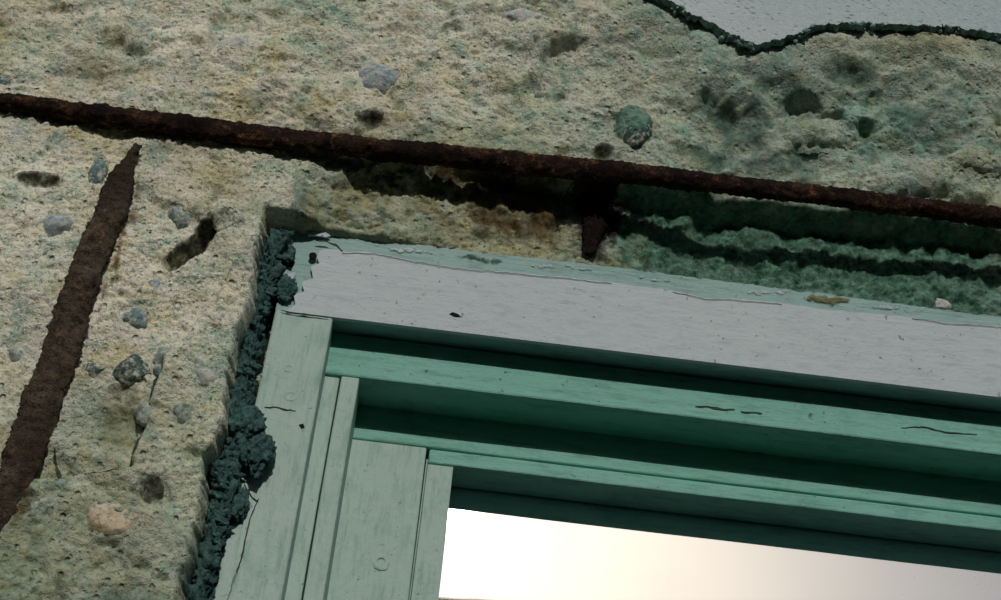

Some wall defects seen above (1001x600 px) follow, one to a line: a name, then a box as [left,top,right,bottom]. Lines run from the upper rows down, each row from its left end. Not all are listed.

spalling [0,0,1001,207]
spalling [42,214,74,237]
spalling [168,206,191,229]
spalling [708,192,755,225]
spalling [148,278,167,288]
spalling [12,300,35,314]
spalling [7,346,24,362]
spalling [253,292,278,406]
spalling [112,354,152,386]
spalling [195,369,217,386]
spalling [133,402,153,428]
spalling [87,501,139,536]